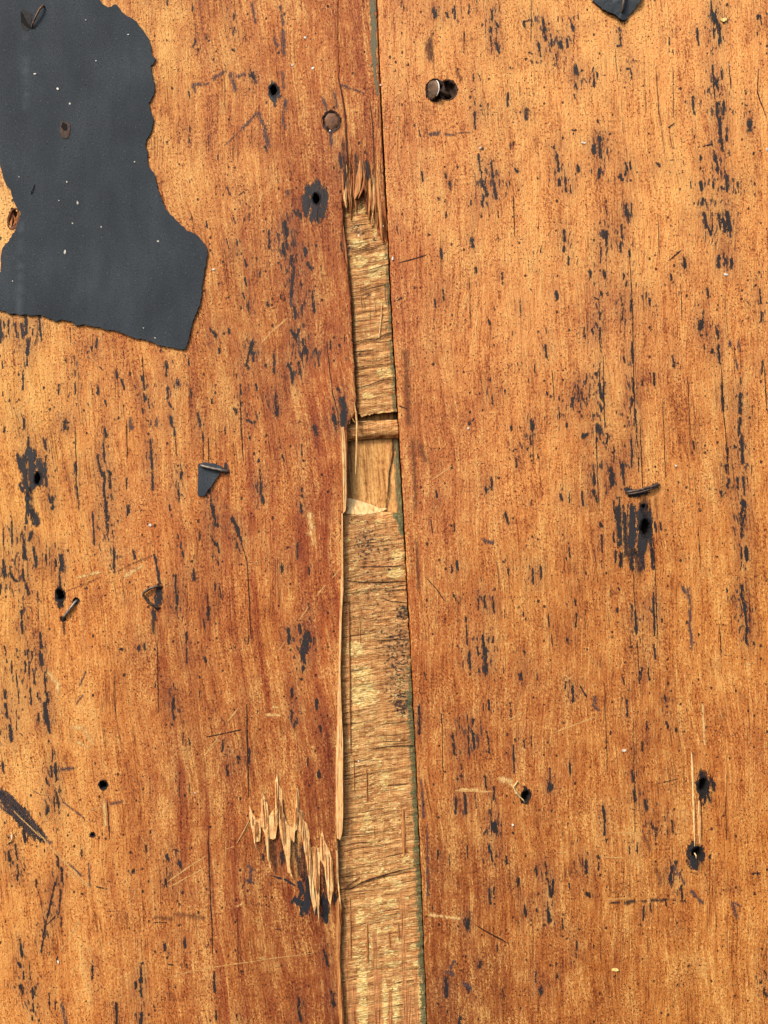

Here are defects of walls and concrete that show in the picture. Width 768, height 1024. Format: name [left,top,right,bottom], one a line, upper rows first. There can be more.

spalling [7,208,20,235]
peeling [337,146,427,1024]